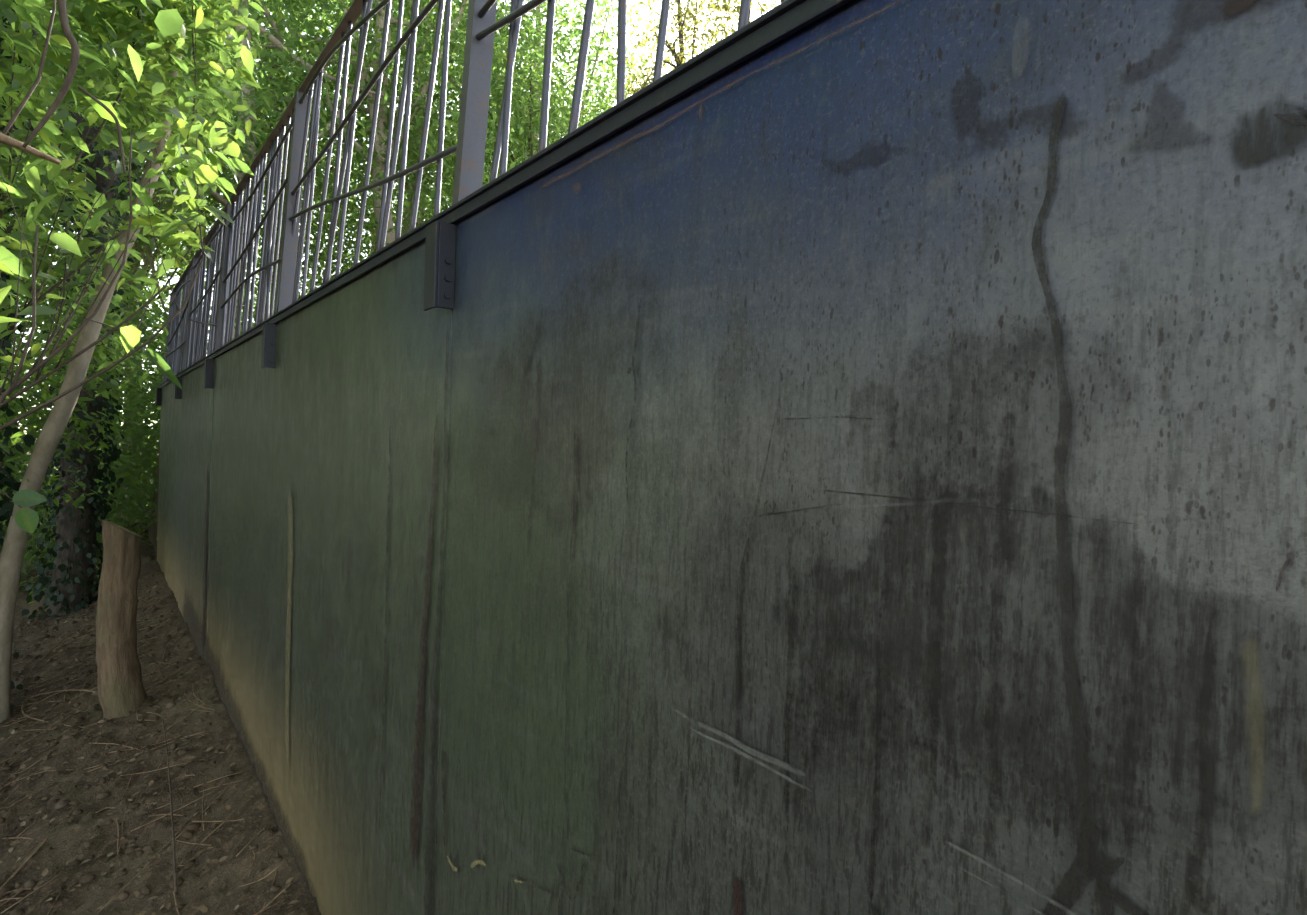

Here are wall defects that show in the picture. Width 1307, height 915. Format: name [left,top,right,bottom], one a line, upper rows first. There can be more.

crack [735,418,1048,756]
damp [784,94,1306,915]